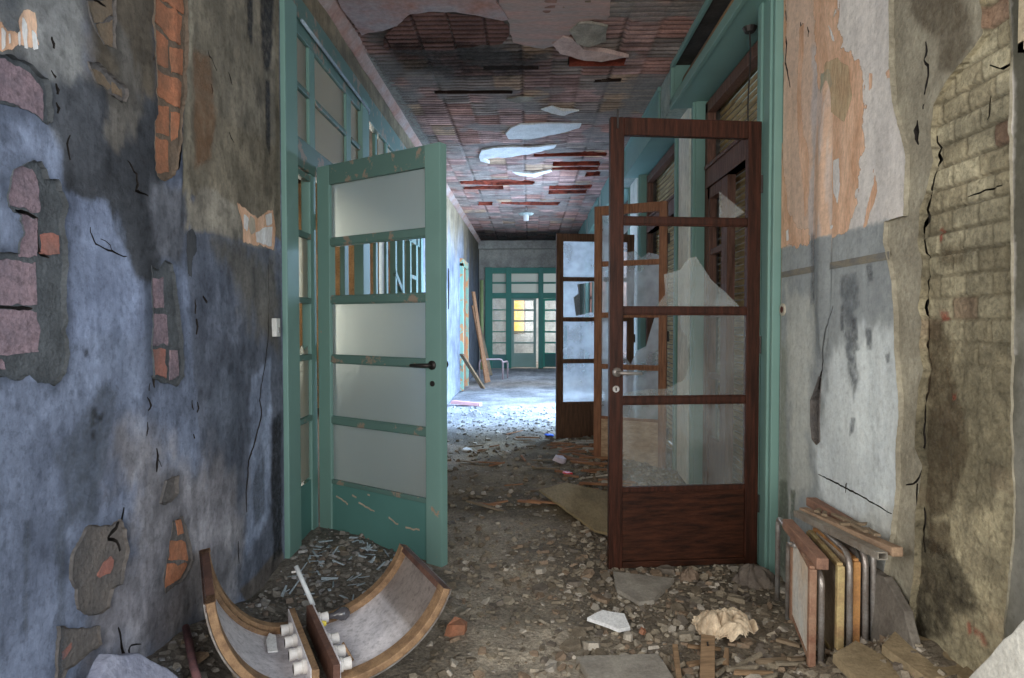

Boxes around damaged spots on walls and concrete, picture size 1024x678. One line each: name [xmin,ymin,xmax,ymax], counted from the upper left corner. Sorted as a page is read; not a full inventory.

flaking render [0,9,54,125]
flaking render [435,90,606,205]
peeling [813,0,877,238]
crack [914,42,943,161]
flaking render [0,160,70,386]
crack [90,227,127,257]
crack [246,264,269,512]
damp [841,279,871,384]
crack [906,256,932,552]
flaking render [883,0,1016,672]
crack [818,474,892,514]
flaking render [54,519,130,678]